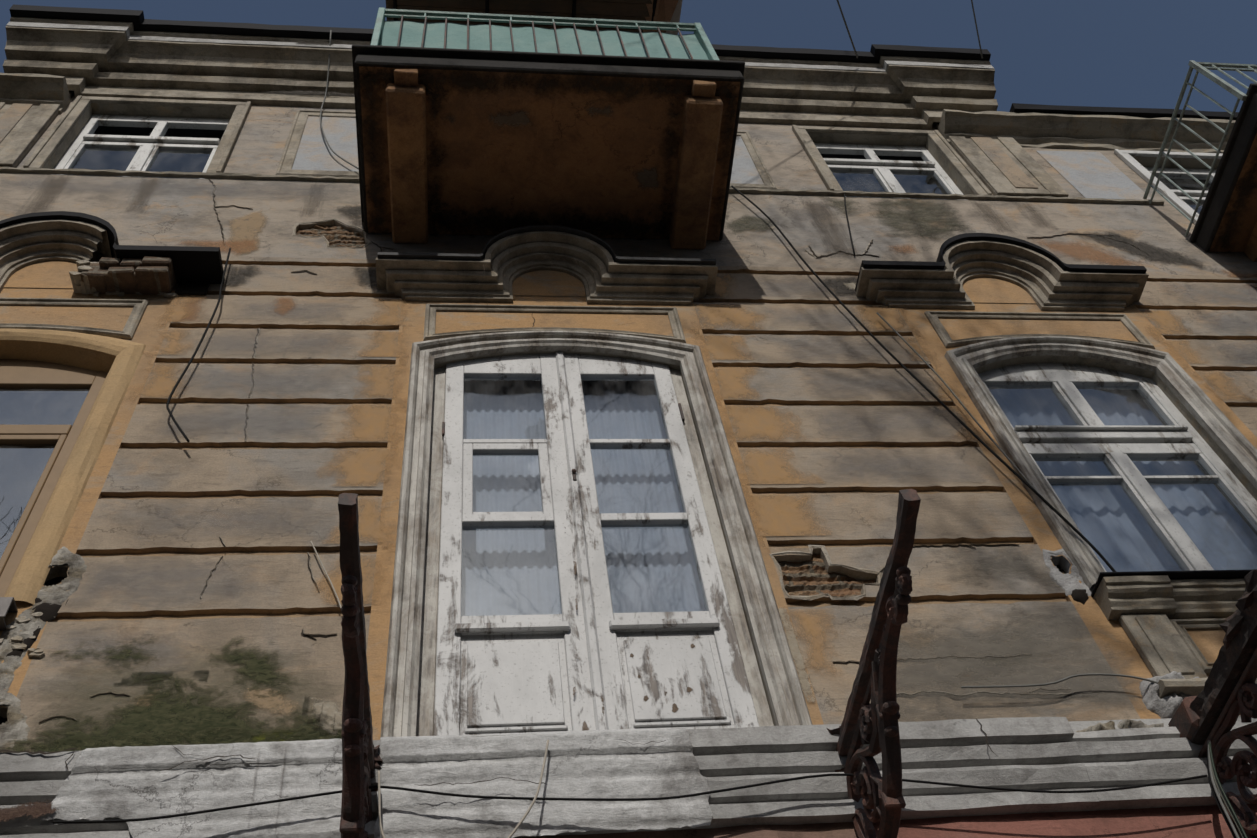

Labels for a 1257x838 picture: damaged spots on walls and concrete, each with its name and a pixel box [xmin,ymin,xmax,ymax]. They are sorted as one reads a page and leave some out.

crack [209,179,253,246]
spalling [292,219,372,249]
spalling [69,256,210,299]
spalling [769,545,882,600]
spalling [1042,549,1089,605]
spalling [0,546,87,753]